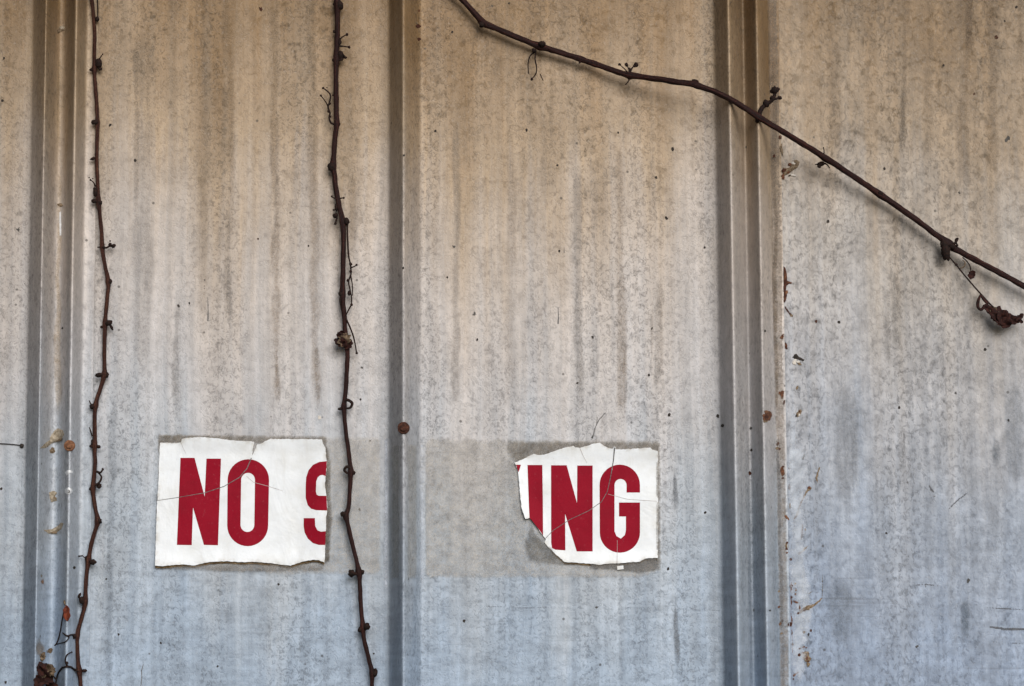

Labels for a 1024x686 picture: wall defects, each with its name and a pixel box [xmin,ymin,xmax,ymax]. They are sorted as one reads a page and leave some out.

rust [769,582,812,680]